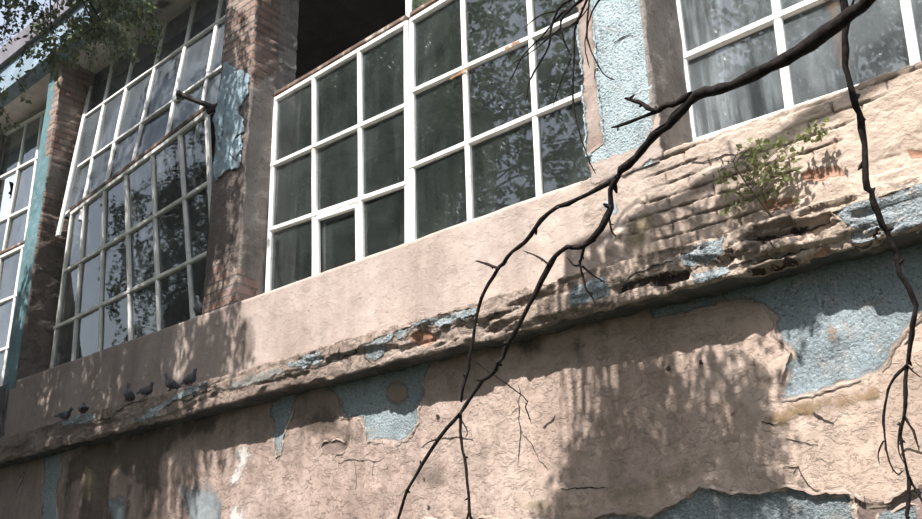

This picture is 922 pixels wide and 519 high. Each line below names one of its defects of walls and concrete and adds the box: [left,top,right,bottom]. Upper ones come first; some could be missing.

spalling [575,0,605,157]
peeling [212,62,250,182]
flaking render [801,166,845,182]
flaking render [650,181,922,402]
peeling [364,305,477,360]
flaking render [267,394,300,458]
flaking render [326,362,430,446]
crack [761,411,834,445]
water stain [65,416,216,519]
peeling [182,486,222,519]
flaking render [588,481,922,519]
crack [783,466,820,492]